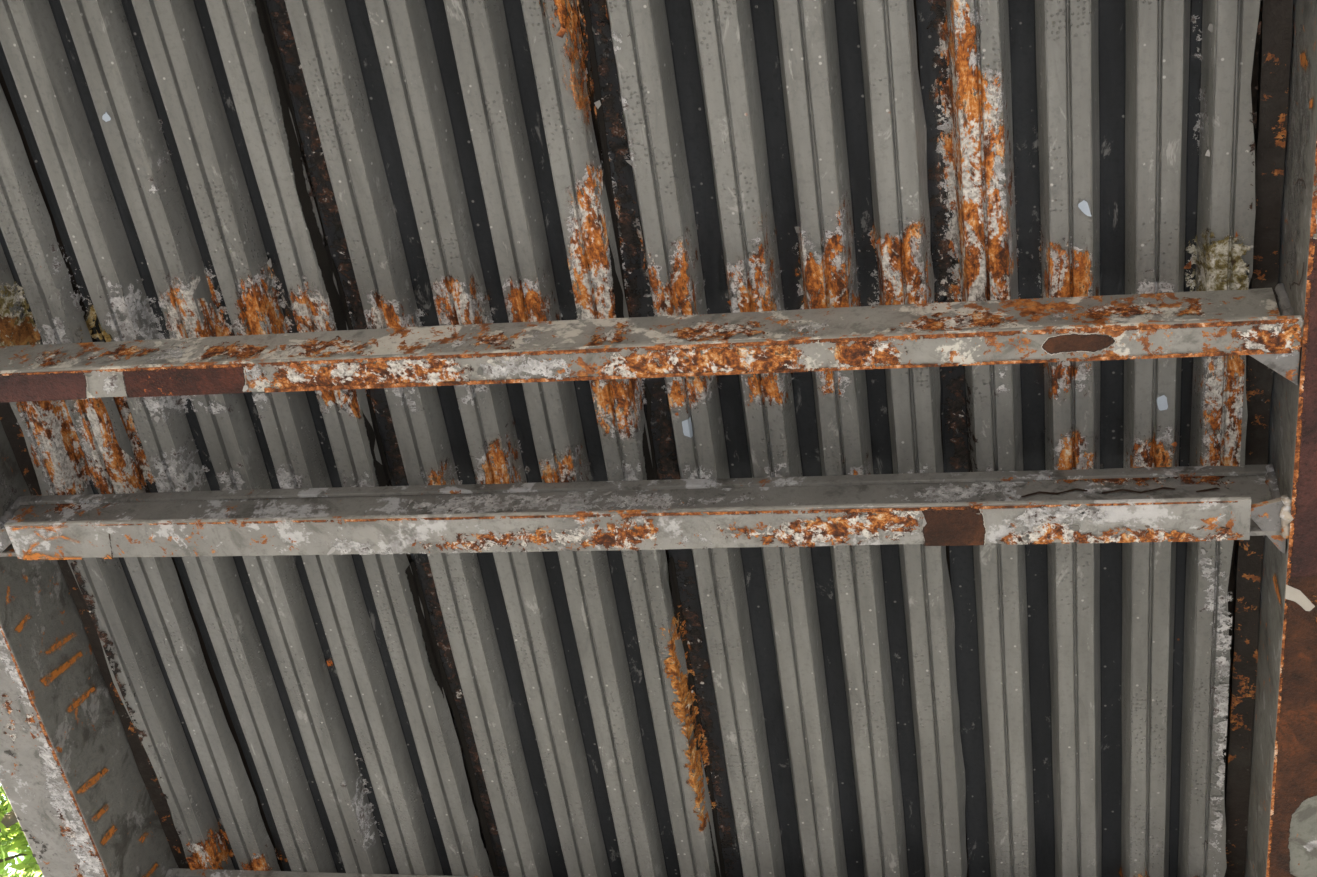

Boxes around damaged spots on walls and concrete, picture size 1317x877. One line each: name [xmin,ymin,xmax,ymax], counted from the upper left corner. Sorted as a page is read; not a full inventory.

corrosion [2,0,1317,585]
peeling [1266,238,1317,877]
peeling [0,624,108,877]
corrosion [0,615,117,877]
corrosion [186,822,289,871]
corrosion [1266,575,1288,877]